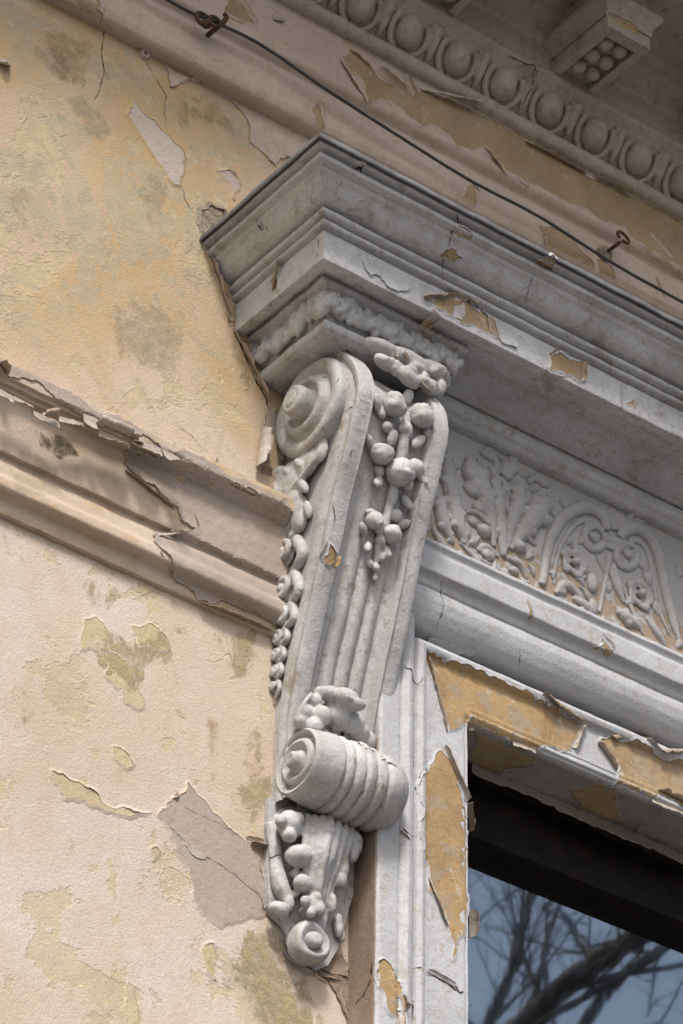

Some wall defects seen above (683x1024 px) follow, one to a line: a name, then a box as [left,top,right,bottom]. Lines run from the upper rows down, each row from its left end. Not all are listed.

crack [95,33,109,98]
peeling [124,97,187,190]
peeling [340,47,683,300]
peeling [419,292,499,339]
peeling [547,348,588,385]
peeling [0,363,291,630]
peeling [77,614,147,713]
peeling [129,621,171,654]
peeling [415,633,683,965]
peeling [49,768,268,982]
peeling [374,956,414,1024]